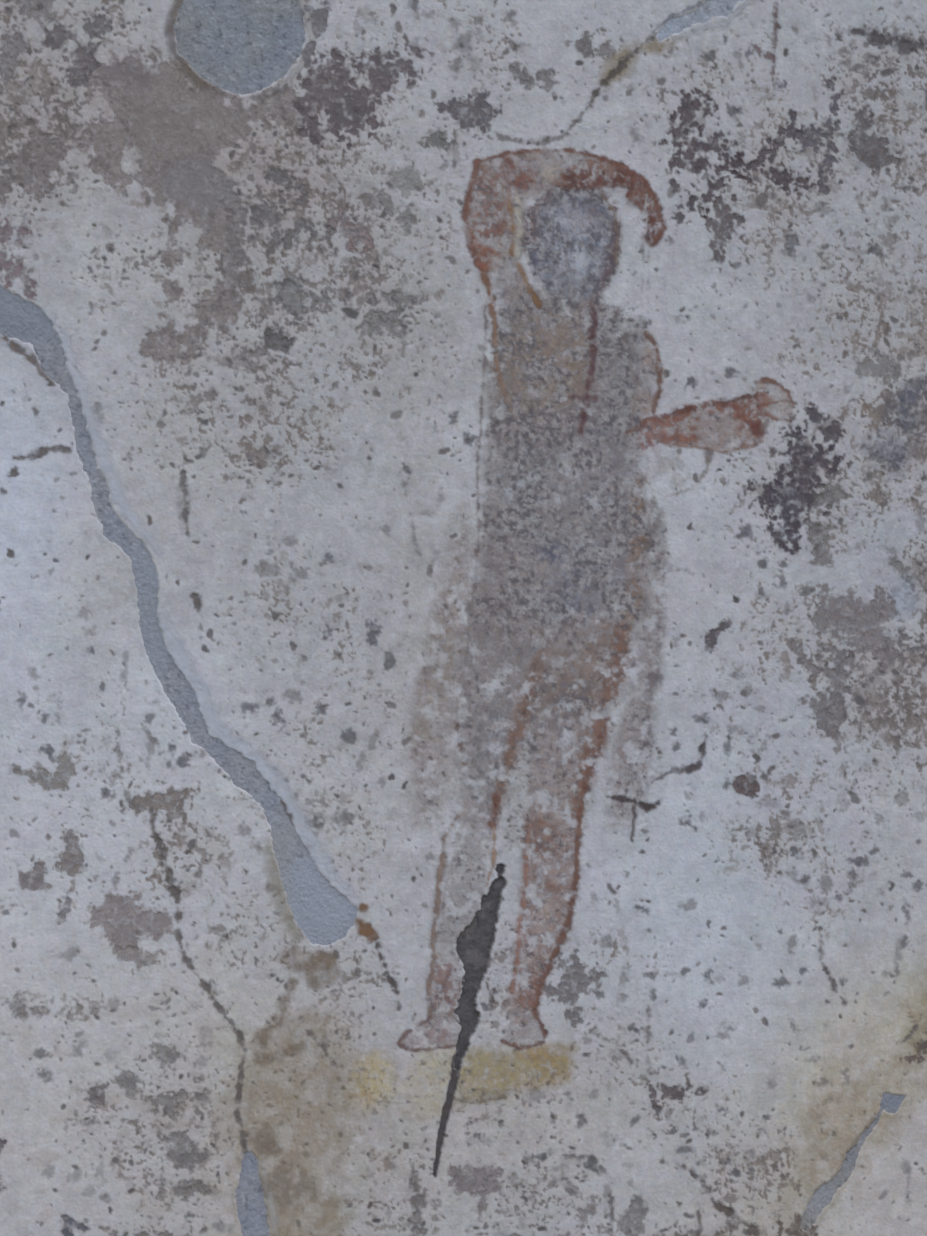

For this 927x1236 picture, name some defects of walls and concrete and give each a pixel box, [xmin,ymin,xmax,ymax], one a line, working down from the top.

peeling [0,0,428,364]
crack [0,285,358,945]
peeling [14,754,75,790]
peeling [129,789,195,813]
peeling [19,830,83,891]
peeling [90,892,172,968]
crack [375,942,401,1011]
crack [150,809,279,1236]
crack [433,1055,459,1177]
peeling [778,1216,817,1236]